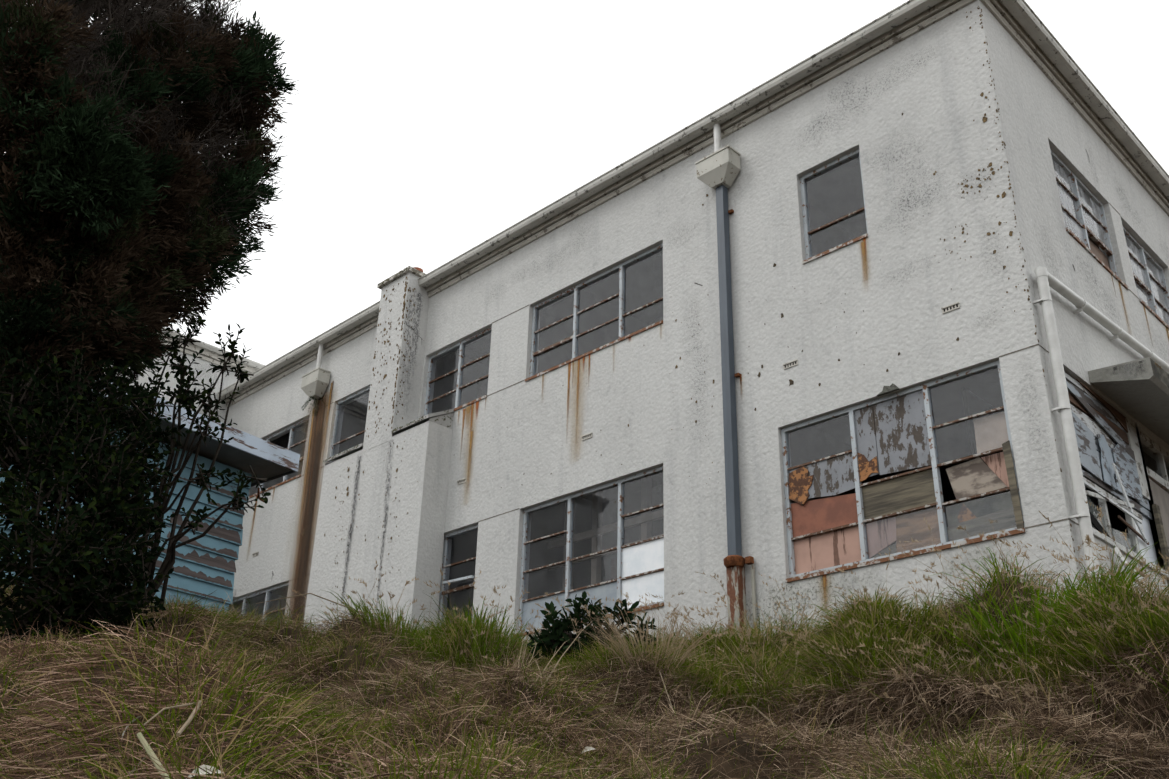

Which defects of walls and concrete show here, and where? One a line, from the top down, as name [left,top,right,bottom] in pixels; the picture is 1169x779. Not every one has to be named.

spalling [958,6,1039,342]
peeling [365,269,418,437]
rust [458,399,486,459]
rust [568,354,590,399]
peeling [148,467,247,602]